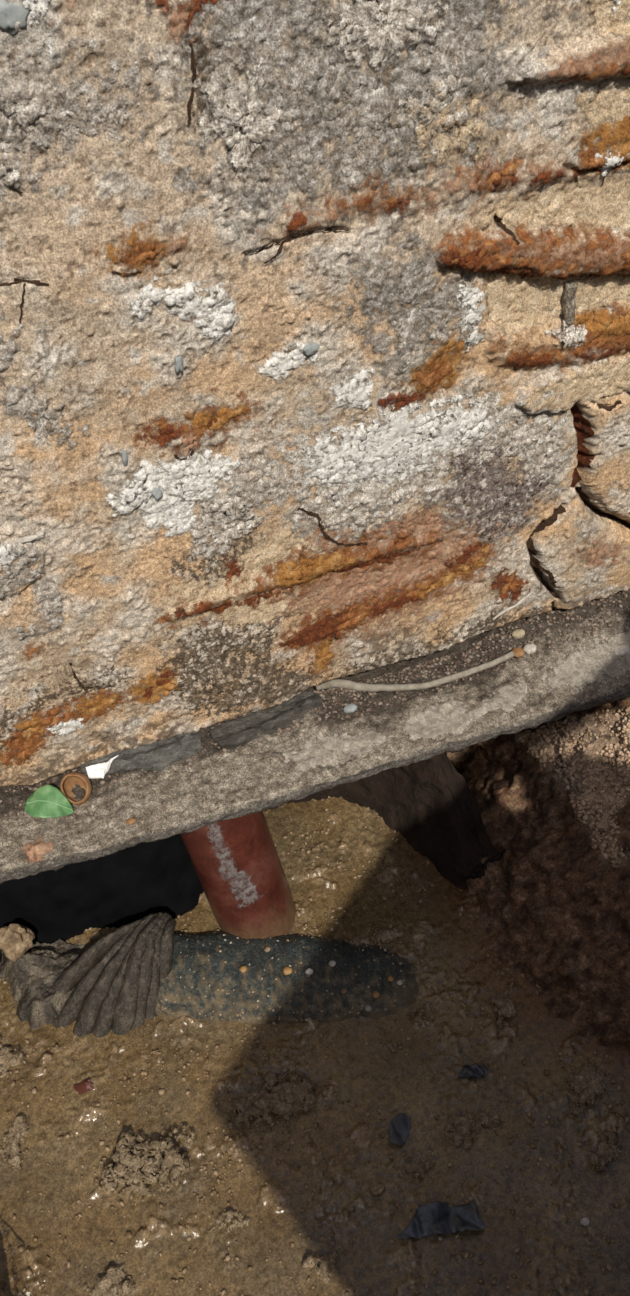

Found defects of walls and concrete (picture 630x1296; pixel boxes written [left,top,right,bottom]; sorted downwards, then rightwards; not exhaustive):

rust [284,82,630,280]
rust [92,221,191,278]
rust [491,301,630,375]
rust [133,389,258,459]
crack [527,378,630,609]
rust [158,505,530,674]
rust [0,667,180,767]